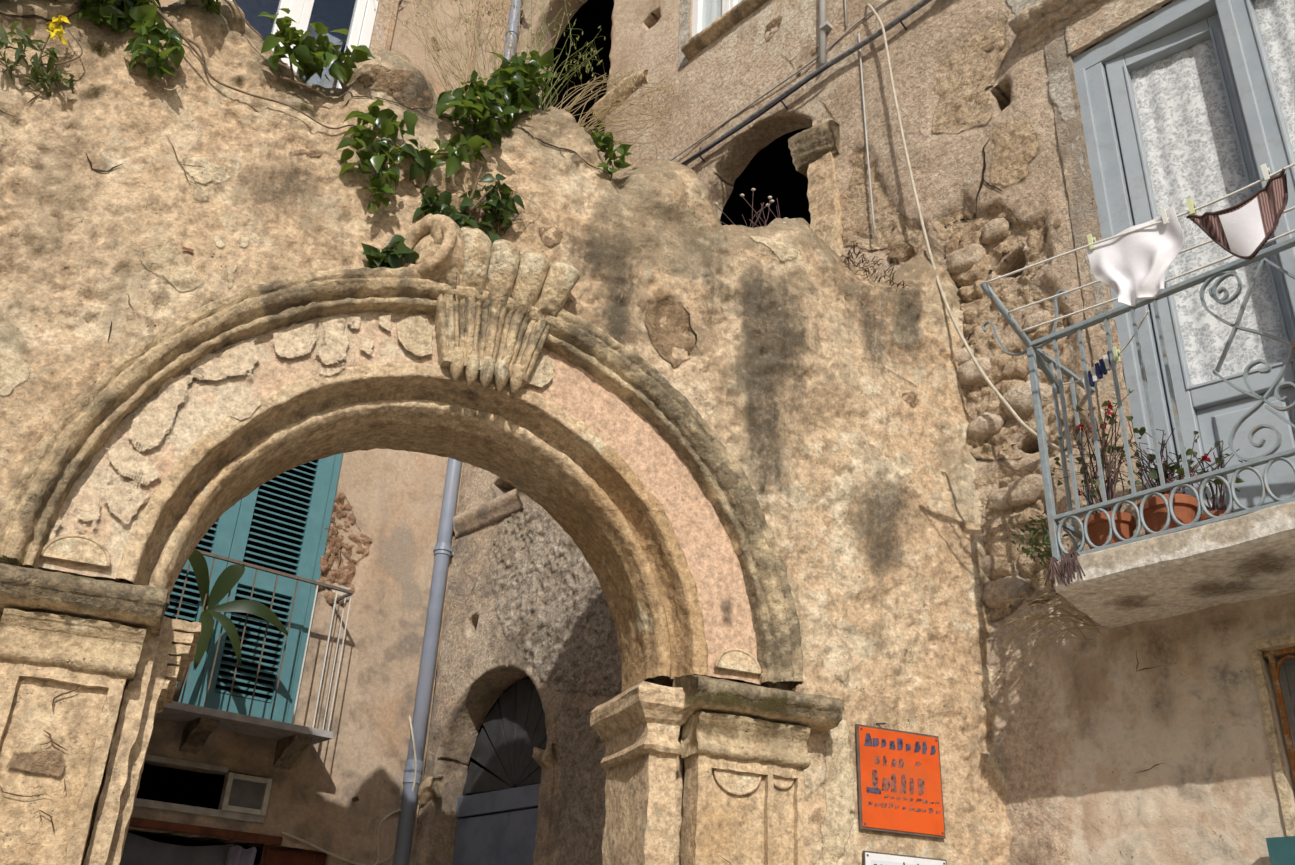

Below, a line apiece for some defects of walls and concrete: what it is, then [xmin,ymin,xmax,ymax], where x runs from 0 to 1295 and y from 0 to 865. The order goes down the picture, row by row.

leakage [900,289,922,343]
leakage [739,271,803,451]
leakage [868,495,900,569]
leakage [1195,554,1292,595]